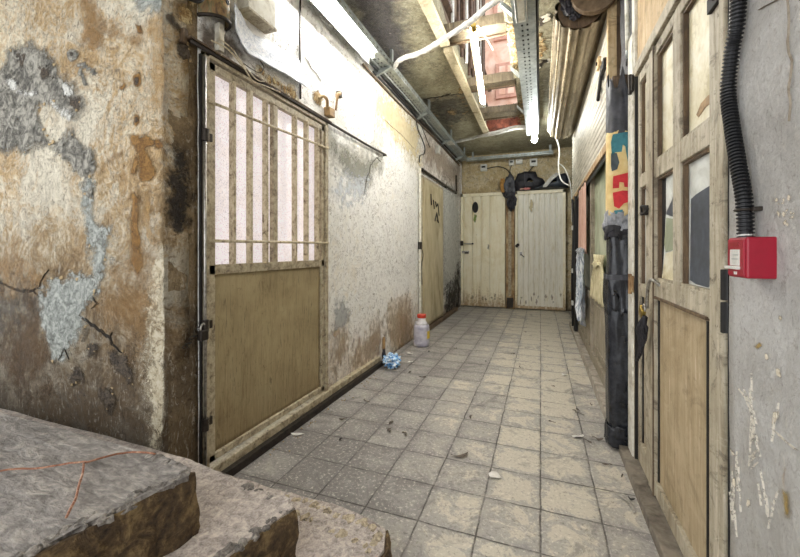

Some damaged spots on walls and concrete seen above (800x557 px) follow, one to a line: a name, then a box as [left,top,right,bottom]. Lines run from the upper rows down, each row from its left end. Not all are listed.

spalling [0,40,110,363]
water stain [166,143,196,235]
crack [0,269,49,298]
water stain [443,262,461,313]
crack [58,297,122,360]